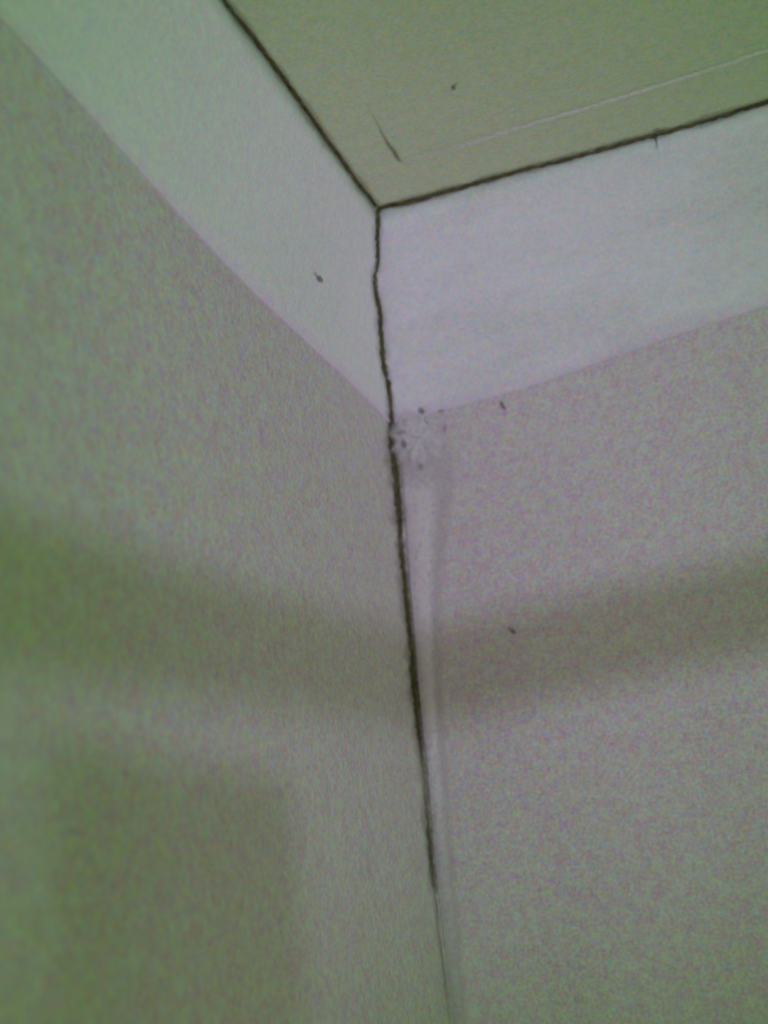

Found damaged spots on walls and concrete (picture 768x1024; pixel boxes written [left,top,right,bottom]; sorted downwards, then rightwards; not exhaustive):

crack [224,0,768,754]
crack [427,829,435,872]